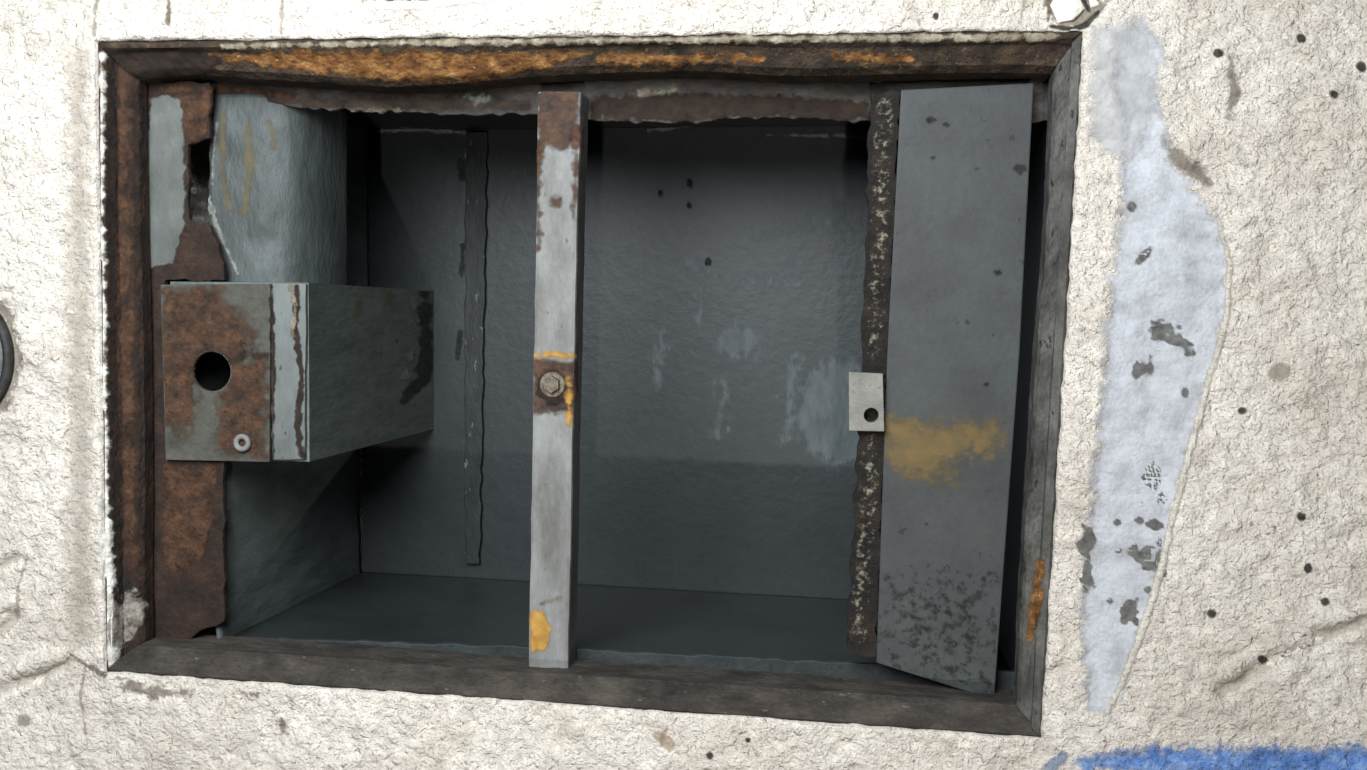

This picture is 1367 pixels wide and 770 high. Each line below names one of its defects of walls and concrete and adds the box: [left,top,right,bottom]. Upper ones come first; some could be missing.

corrosion [103,45,869,625]
spalling [96,0,1102,738]
corrosion [831,51,915,68]
corrosion [1025,559,1045,641]